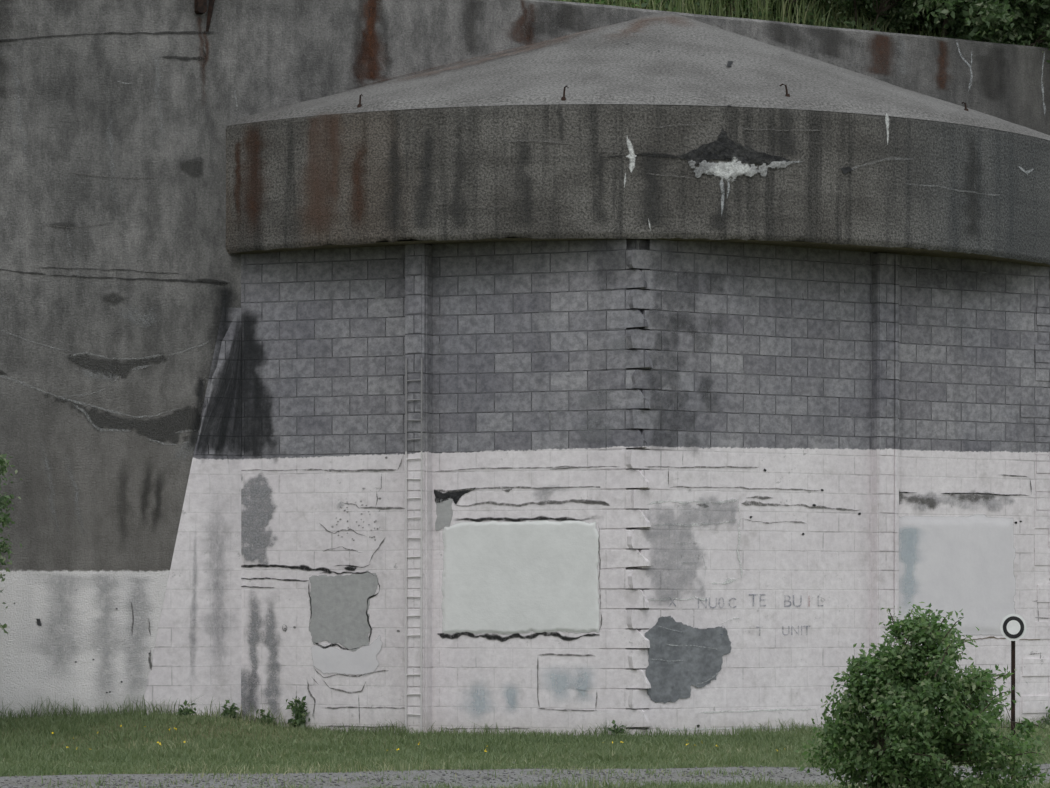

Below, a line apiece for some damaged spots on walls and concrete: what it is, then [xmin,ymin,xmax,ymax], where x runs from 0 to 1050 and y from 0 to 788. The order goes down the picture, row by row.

crack [0,31,210,60]
rust [358,0,377,78]
spalling [678,128,799,214]
crack [0,267,230,285]
spalling [69,352,167,378]
spalling [37,389,201,451]
peeling [434,488,476,531]
peeling [899,475,1032,509]
spalling [308,501,388,693]
leakage [241,600,279,717]
spalling [645,616,731,703]